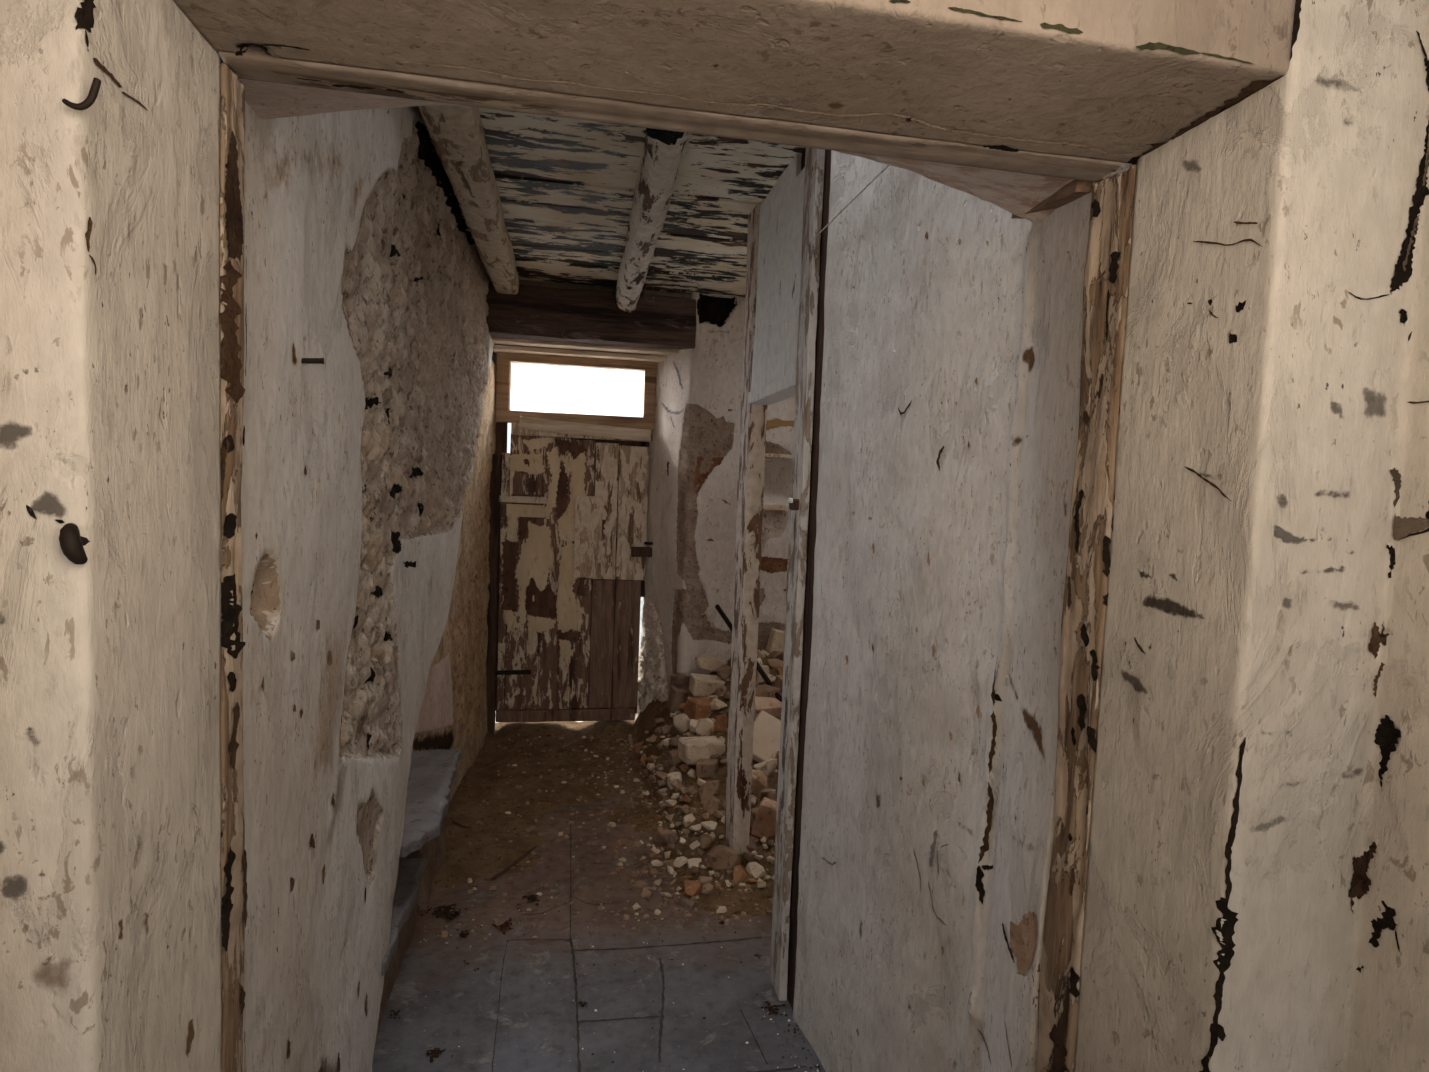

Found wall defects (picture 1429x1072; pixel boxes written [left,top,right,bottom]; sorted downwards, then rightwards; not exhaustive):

peeling [837,151,1075,222]
spalling [327,118,588,765]
water stain [1185,466,1228,499]
spalling [250,533,283,640]
spalling [634,404,735,722]
spalling [757,510,788,651]
water stain [1143,597,1203,618]
water stain [1122,672,1147,693]
crack [1199,738,1246,1072]
spalling [1349,842,1400,952]